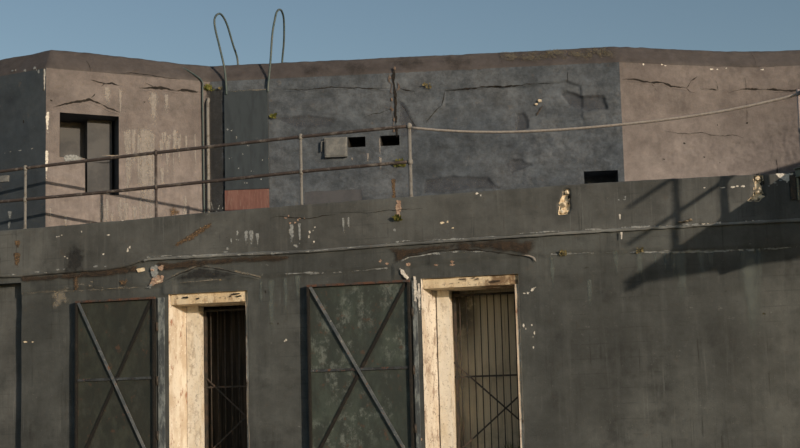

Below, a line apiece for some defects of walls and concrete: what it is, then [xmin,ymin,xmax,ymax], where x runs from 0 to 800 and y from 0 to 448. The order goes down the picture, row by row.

crack [53,62,200,115]
crack [283,67,568,135]
crack [622,77,797,96]
leakage [90,129,196,223]
spalling [558,189,571,215]
spalling [721,173,793,202]
peeling [136,255,181,288]